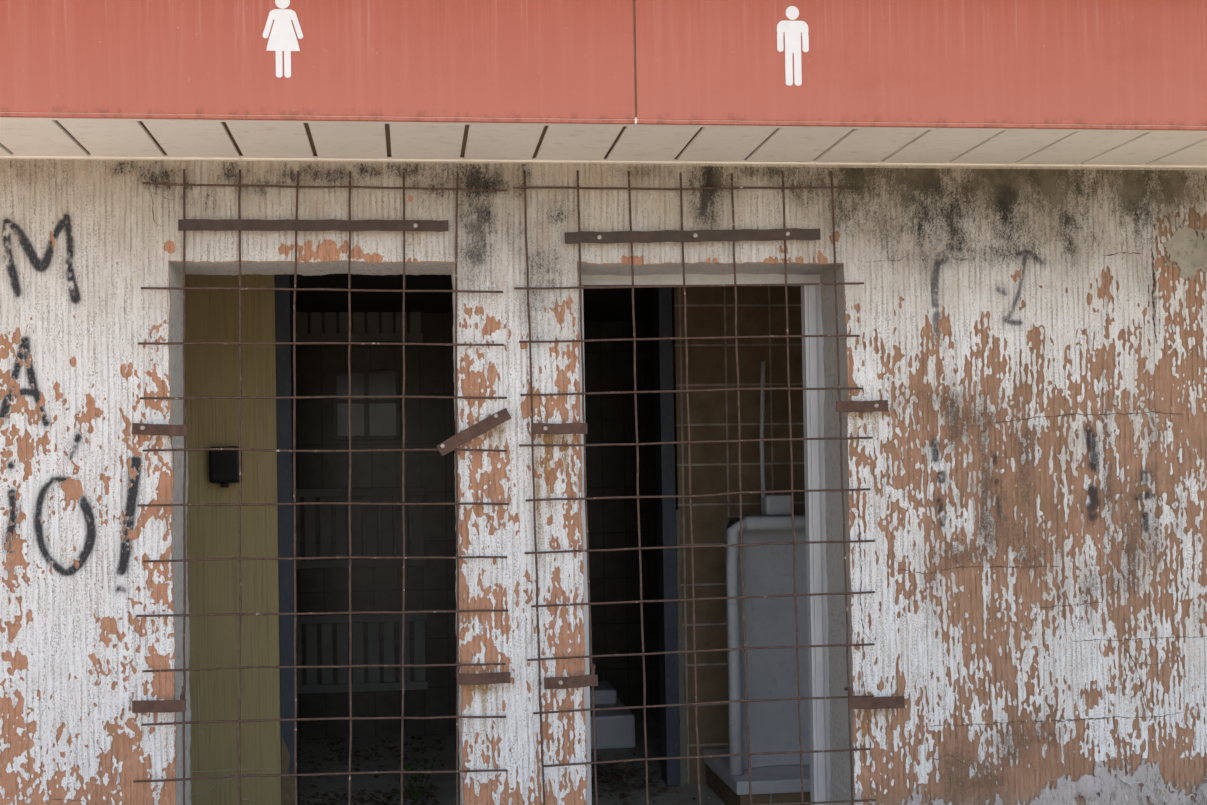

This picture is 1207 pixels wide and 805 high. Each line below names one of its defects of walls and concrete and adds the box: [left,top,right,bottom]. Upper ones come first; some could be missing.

damp [115,161,193,199]
peeling [164,241,175,265]
peeling [278,239,383,263]
damp [218,163,530,267]
damp [686,166,1207,265]
peeling [844,175,1207,805]
peeling [0,317,176,805]
peeling [457,294,587,805]